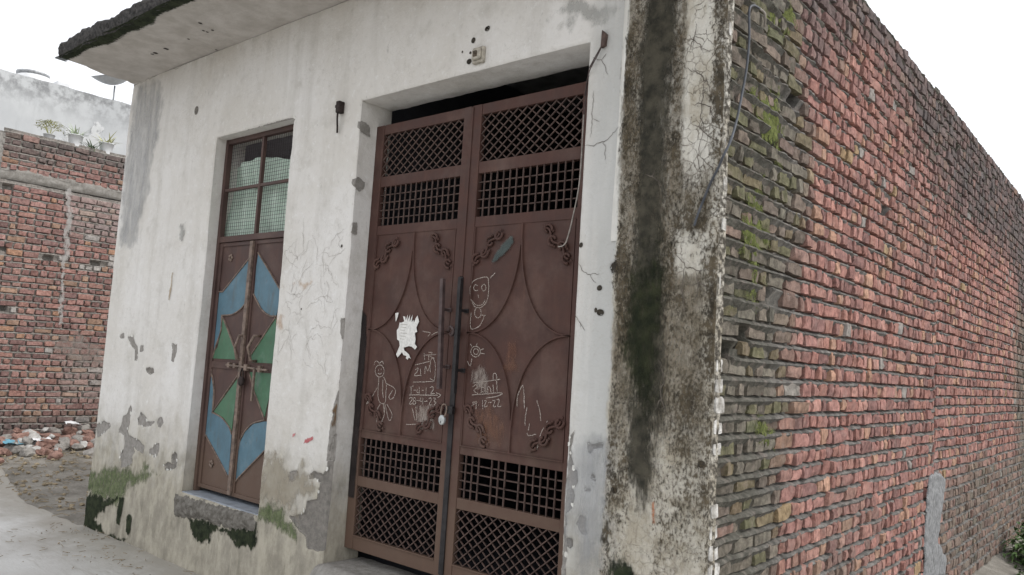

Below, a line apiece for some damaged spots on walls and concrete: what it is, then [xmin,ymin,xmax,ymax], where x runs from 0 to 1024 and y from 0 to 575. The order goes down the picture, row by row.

crack [686,24,718,190]
peeling [120,333,154,375]
crack [276,225,346,374]
water stain [600,0,728,575]
peeling [96,406,178,471]
spalling [289,381,340,552]